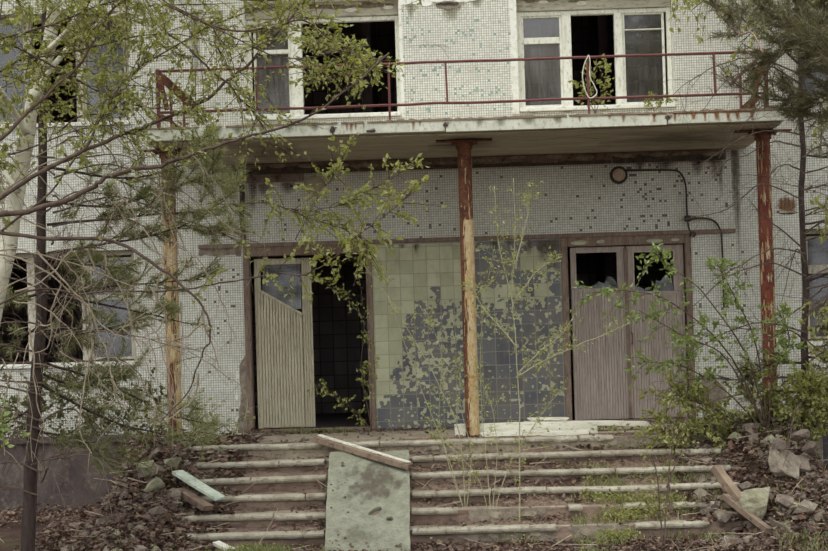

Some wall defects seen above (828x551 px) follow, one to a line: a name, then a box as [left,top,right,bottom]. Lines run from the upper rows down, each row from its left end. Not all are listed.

spalling [432,0,465,9]
rust [650,110,760,121]
peeling [233,152,731,456]